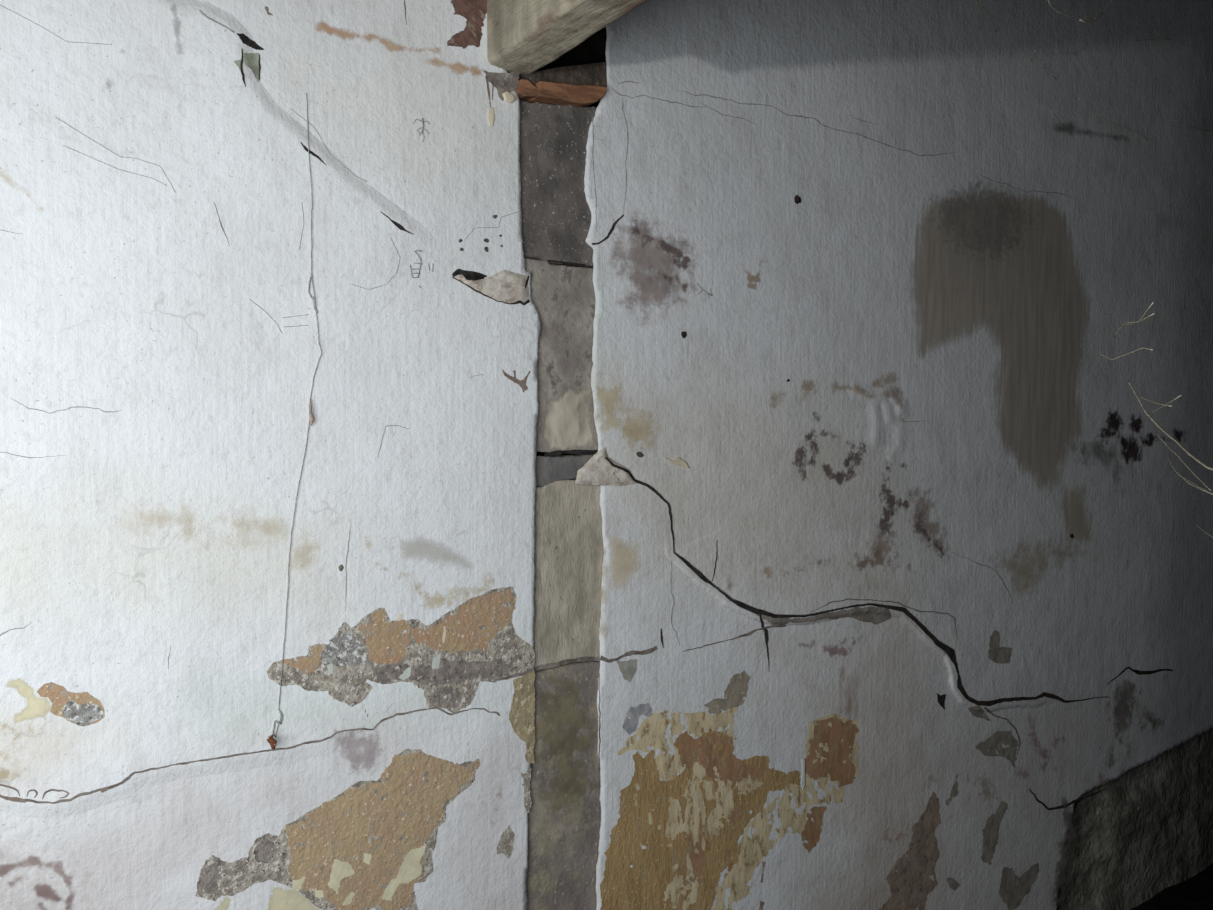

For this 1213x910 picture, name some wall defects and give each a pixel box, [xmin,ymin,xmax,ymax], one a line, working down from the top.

leakage [615,222,690,304]
leakage [915,194,1182,487]
crack [344,526,352,610]
flaking render [6,679,105,726]
crack [0,707,500,804]
flaking render [195,749,480,910]
flaking render [267,586,535,813]
flaking render [600,671,860,910]
crack [494,457,1173,826]
flaking render [878,774,960,910]
flaking render [981,801,1040,910]